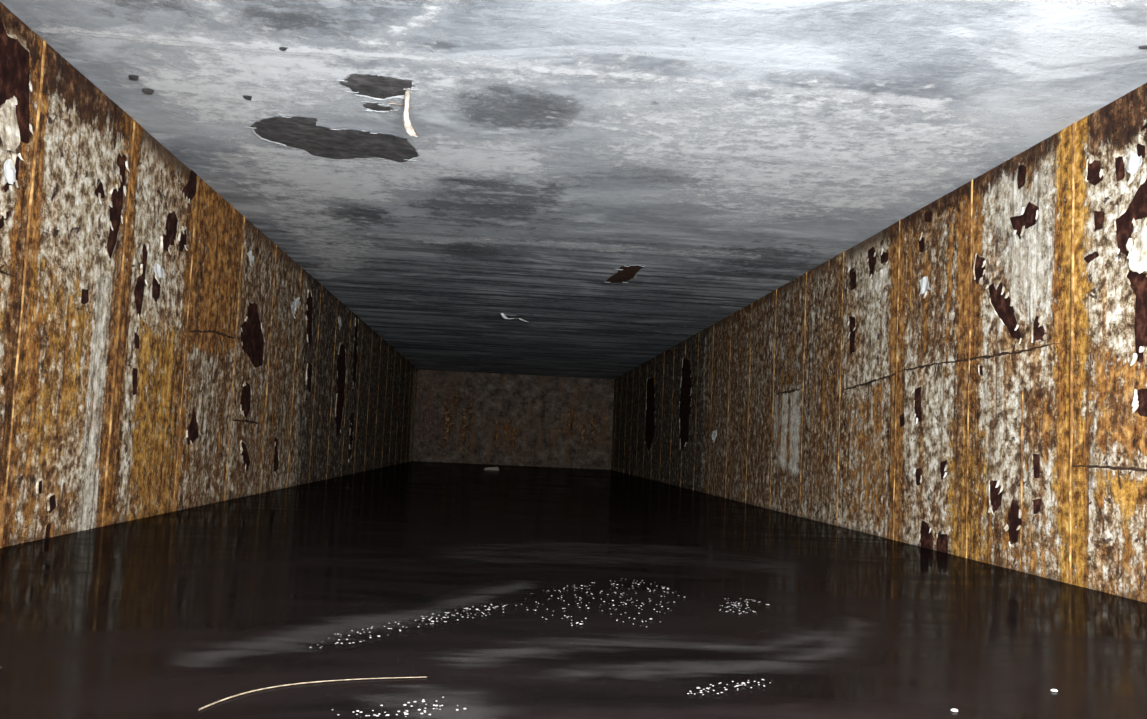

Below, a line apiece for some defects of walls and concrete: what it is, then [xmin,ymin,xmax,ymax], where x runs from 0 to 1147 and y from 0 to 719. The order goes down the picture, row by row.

peeling [0,17,34,229]
peeling [94,149,130,261]
peeling [134,209,188,349]
corrosion [0,2,414,547]
water stain [35,0,1059,326]
corrosion [611,83,1147,603]
crack [844,341,1060,394]
peeling [973,253,1047,344]
peeling [1010,202,1039,239]
peeling [1085,123,1147,366]
peeling [1132,388,1147,417]
crack [1072,465,1147,489]